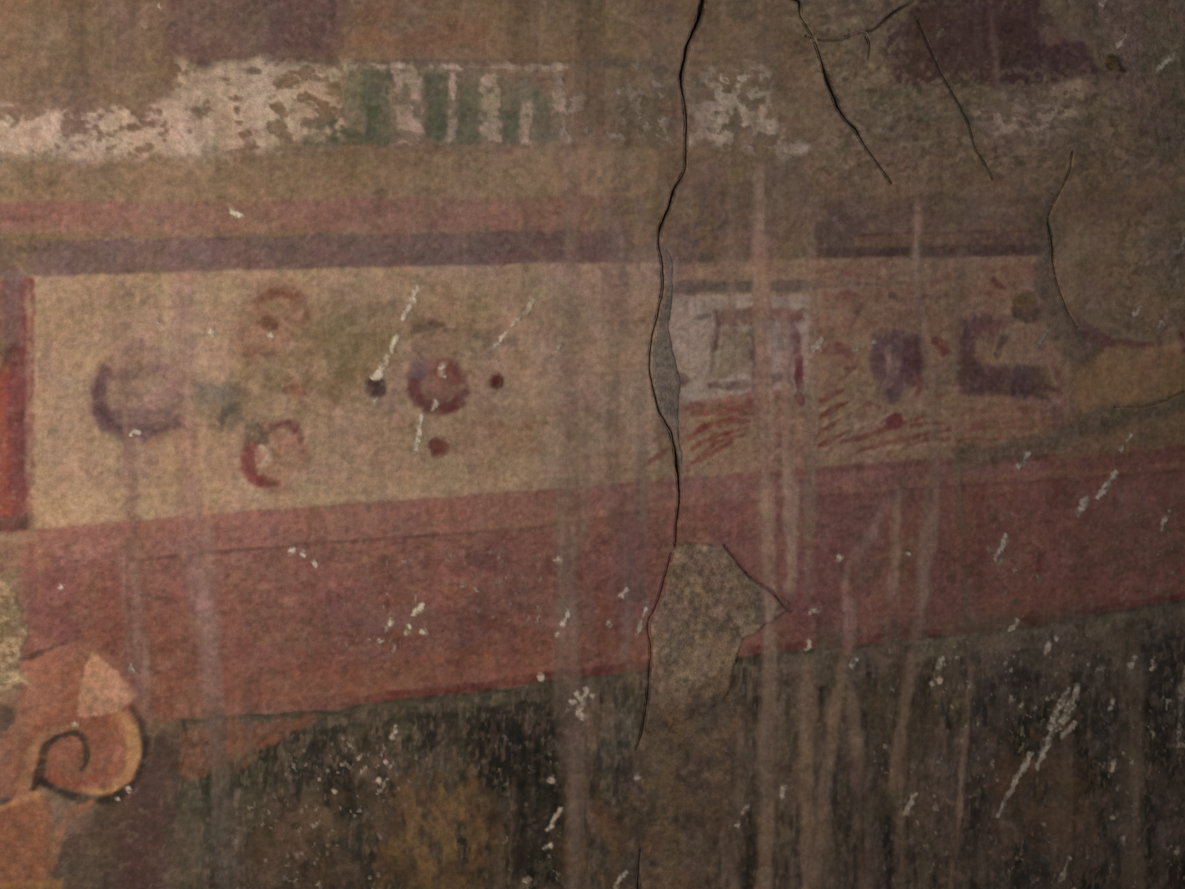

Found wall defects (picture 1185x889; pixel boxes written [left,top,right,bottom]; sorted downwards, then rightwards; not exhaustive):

peeling [0,57,601,165]
peeling [605,63,675,146]
peeling [689,65,812,162]
crack [791,0,995,183]
crack [636,0,708,750]
peeling [0,573,28,691]
crack [725,545,793,613]
damp [752,167,818,889]
damp [798,492,901,889]
damp [889,650,914,856]
damp [956,690,969,835]
crack [635,851,643,889]